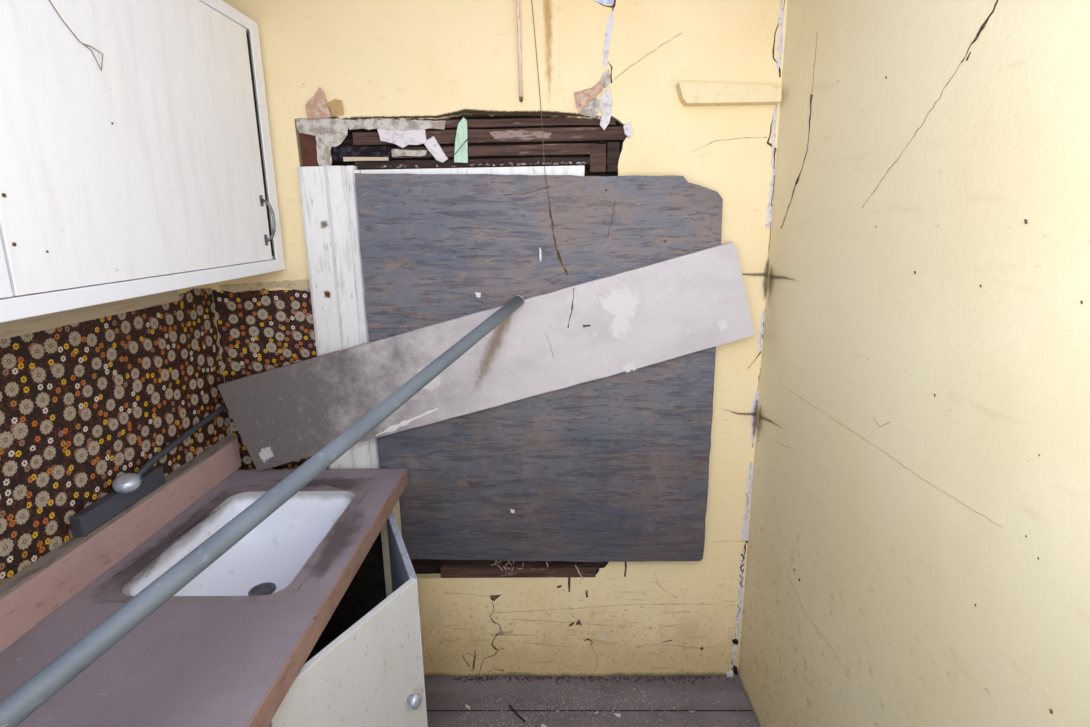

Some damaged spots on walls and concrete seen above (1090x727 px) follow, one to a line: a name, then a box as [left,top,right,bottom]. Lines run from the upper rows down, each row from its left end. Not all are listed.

flaking render [296,81,634,172]
crack [595,0,682,88]
crack [692,38,817,253]
crack [772,0,785,78]
crack [862,0,998,208]
crack [456,310,790,678]